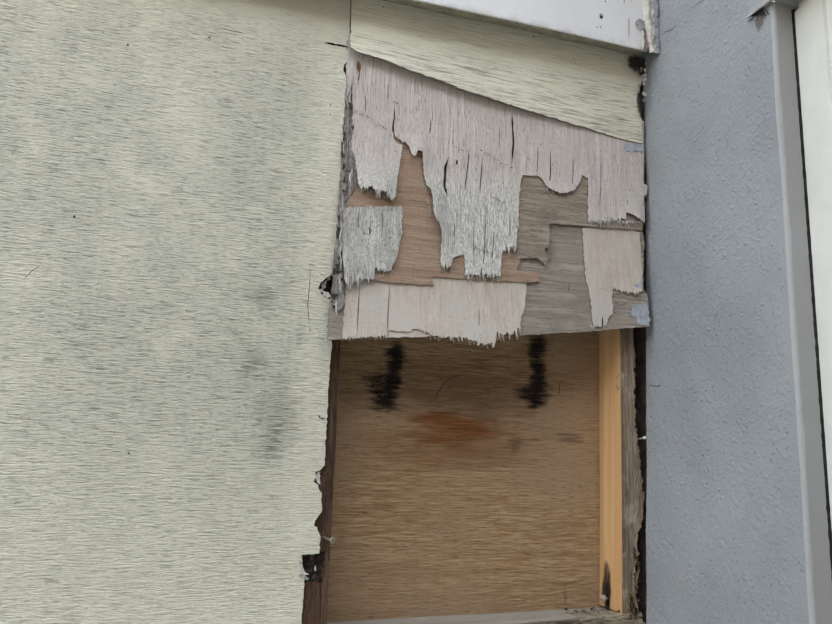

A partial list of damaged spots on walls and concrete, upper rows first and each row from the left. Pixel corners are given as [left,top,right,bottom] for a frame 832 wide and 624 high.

crack [643,0,704,50]
peeling [342,206,403,291]
peeling [385,330,433,338]
water stain [364,341,406,409]
water stain [519,336,549,408]